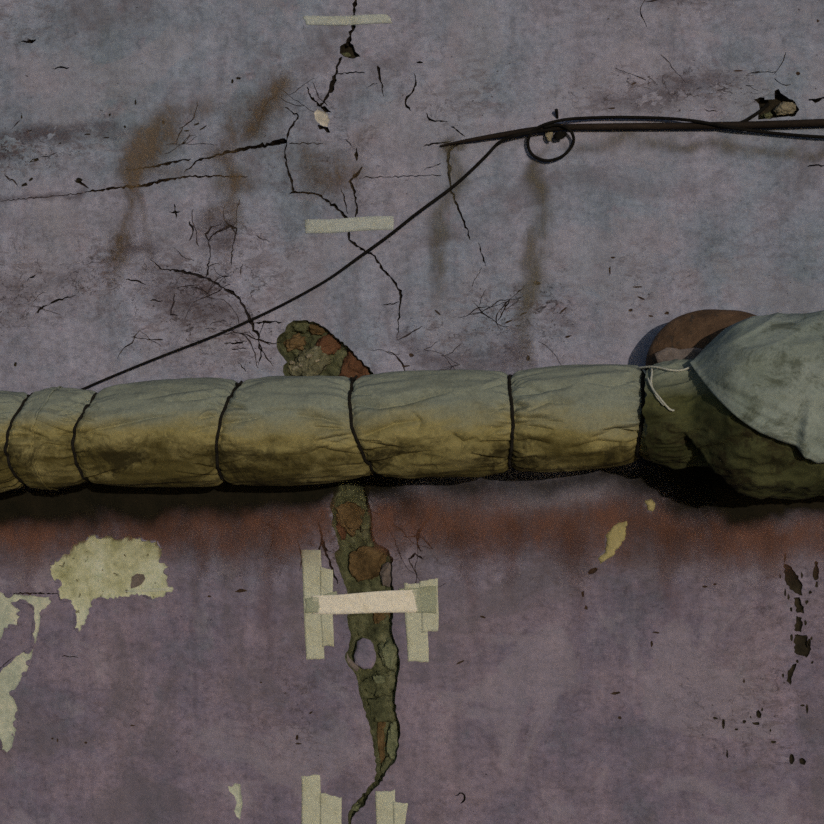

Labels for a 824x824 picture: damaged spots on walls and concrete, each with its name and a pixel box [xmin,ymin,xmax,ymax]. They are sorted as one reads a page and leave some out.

spalling [754,89,799,120]
crack [1,0,524,372]
spalling [277,320,373,379]
spalling [329,479,394,594]
peeling [588,521,627,575]
peeling [0,534,174,754]
spalling [779,555,819,685]
spalling [345,613,401,824]
peeling [228,783,243,819]